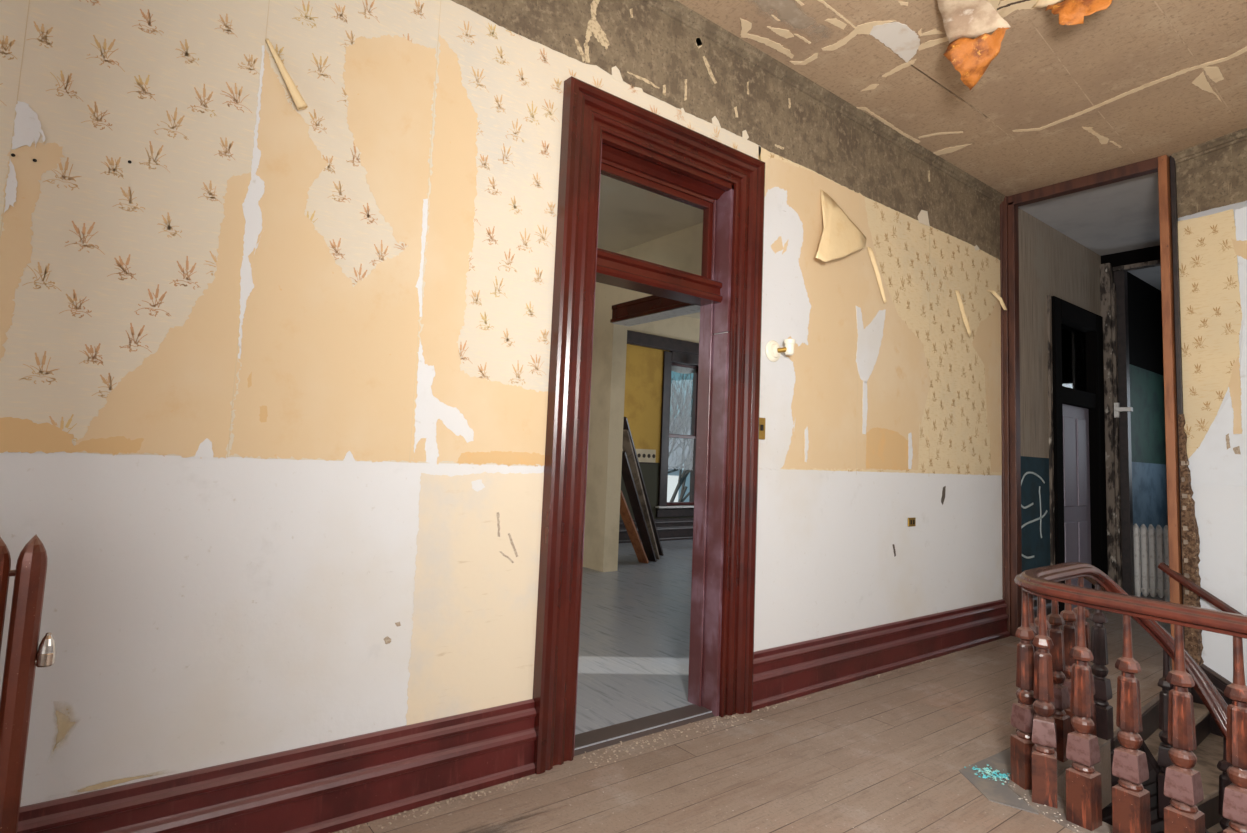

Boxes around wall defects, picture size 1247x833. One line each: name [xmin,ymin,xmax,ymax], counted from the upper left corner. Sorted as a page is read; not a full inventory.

peeling [740,0,949,91]
peeling [988,0,1064,18]
flaking render [4,101,45,213]
flaking render [238,45,265,359]
flaking render [415,199,428,317]
flaking render [1234,207,1247,241]
flaking render [193,438,214,459]
flaking render [414,340,474,464]
flaking render [758,187,811,471]
flaking render [856,306,886,434]
flaking render [1178,256,1247,607]
spalling [1184,627,1204,666]